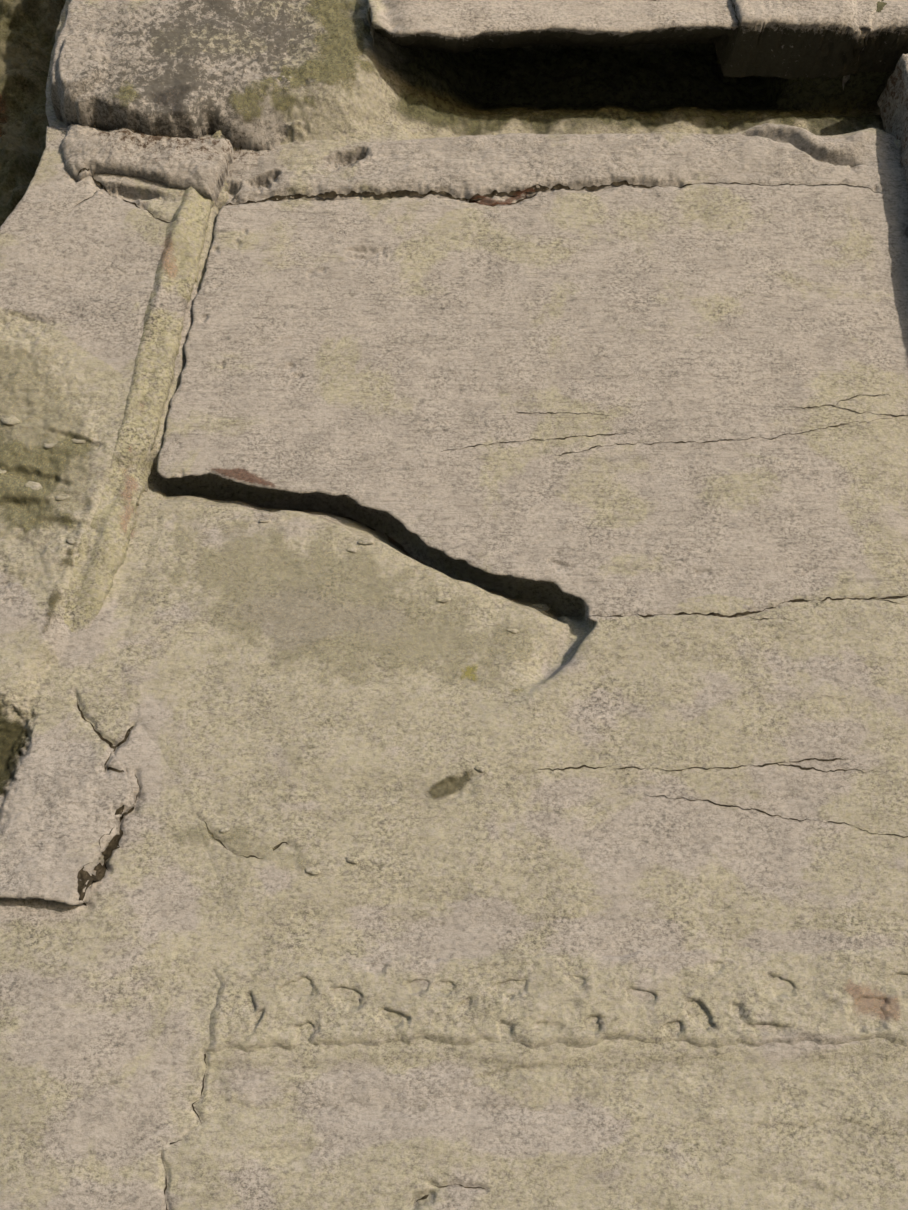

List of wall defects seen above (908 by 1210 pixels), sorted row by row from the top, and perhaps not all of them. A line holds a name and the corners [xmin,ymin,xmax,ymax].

crack [227,180,881,206]
crack [441,394,908,456]
crack [586,595,908,623]
peeling [0,730,136,905]
crack [520,758,908,838]